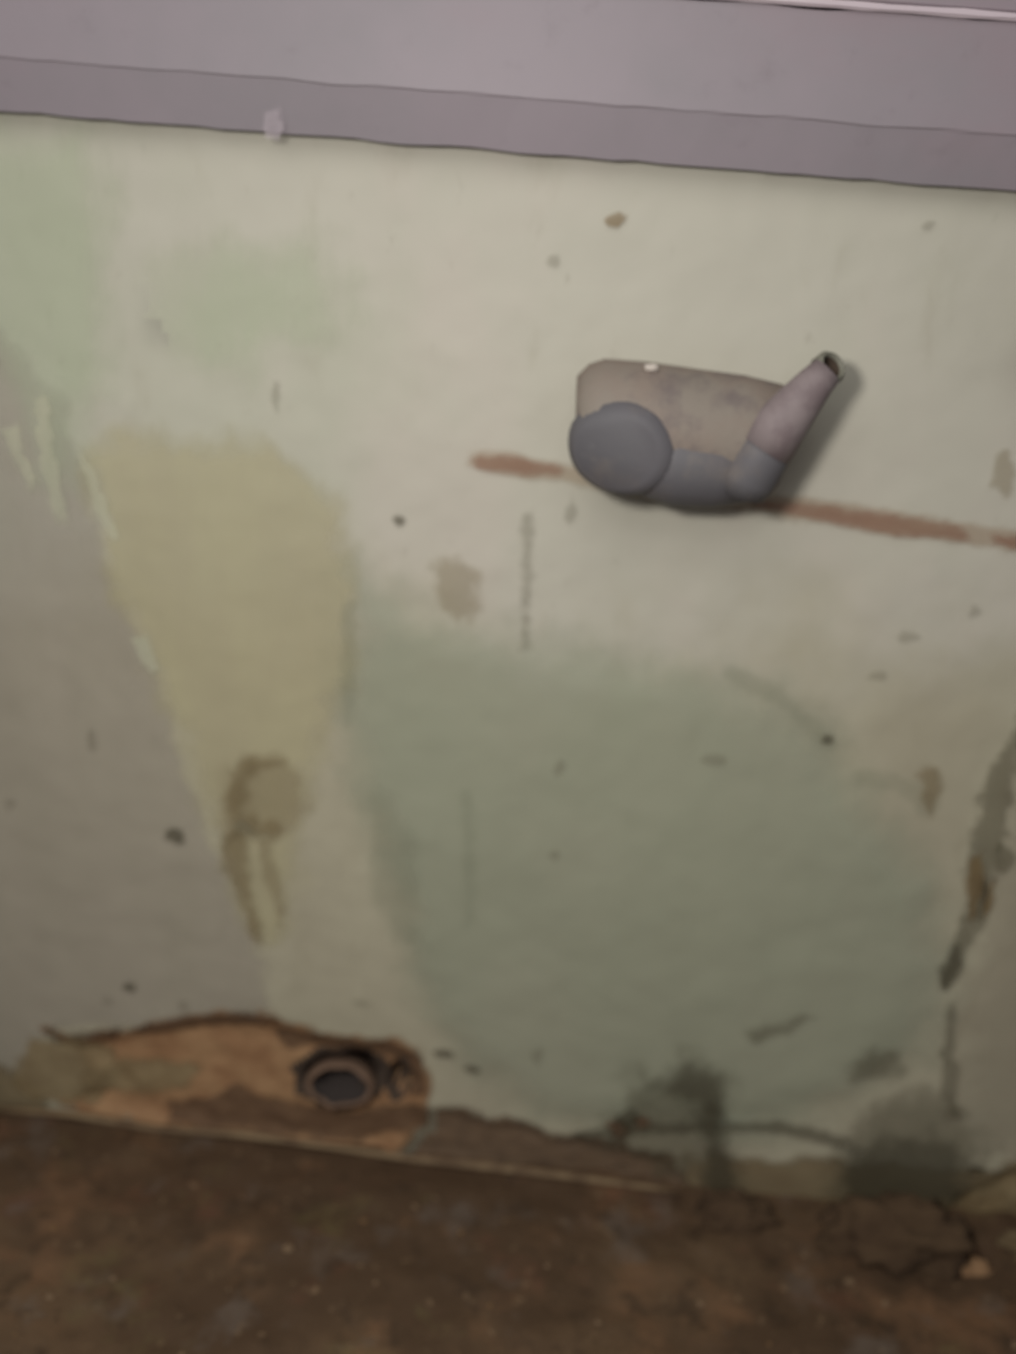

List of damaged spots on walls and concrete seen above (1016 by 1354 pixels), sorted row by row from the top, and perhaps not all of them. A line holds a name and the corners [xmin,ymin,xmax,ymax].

flaking render [13,1011,684,1187]
flaking render [943,1164,1016,1214]